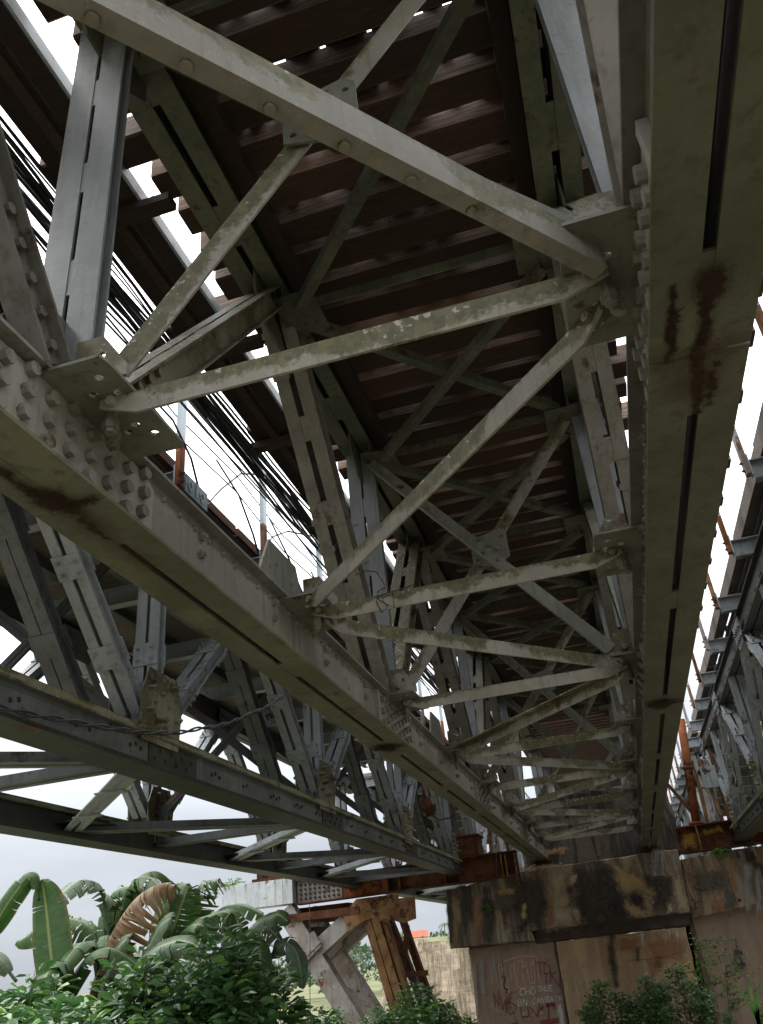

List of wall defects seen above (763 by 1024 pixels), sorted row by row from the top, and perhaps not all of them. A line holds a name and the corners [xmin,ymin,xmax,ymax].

rust [664,286,684,364]
rust [689,265,731,414]
rust [0,469,110,540]
water stain [446,876,548,1007]
water stain [565,849,677,988]
water stain [736,850,763,911]